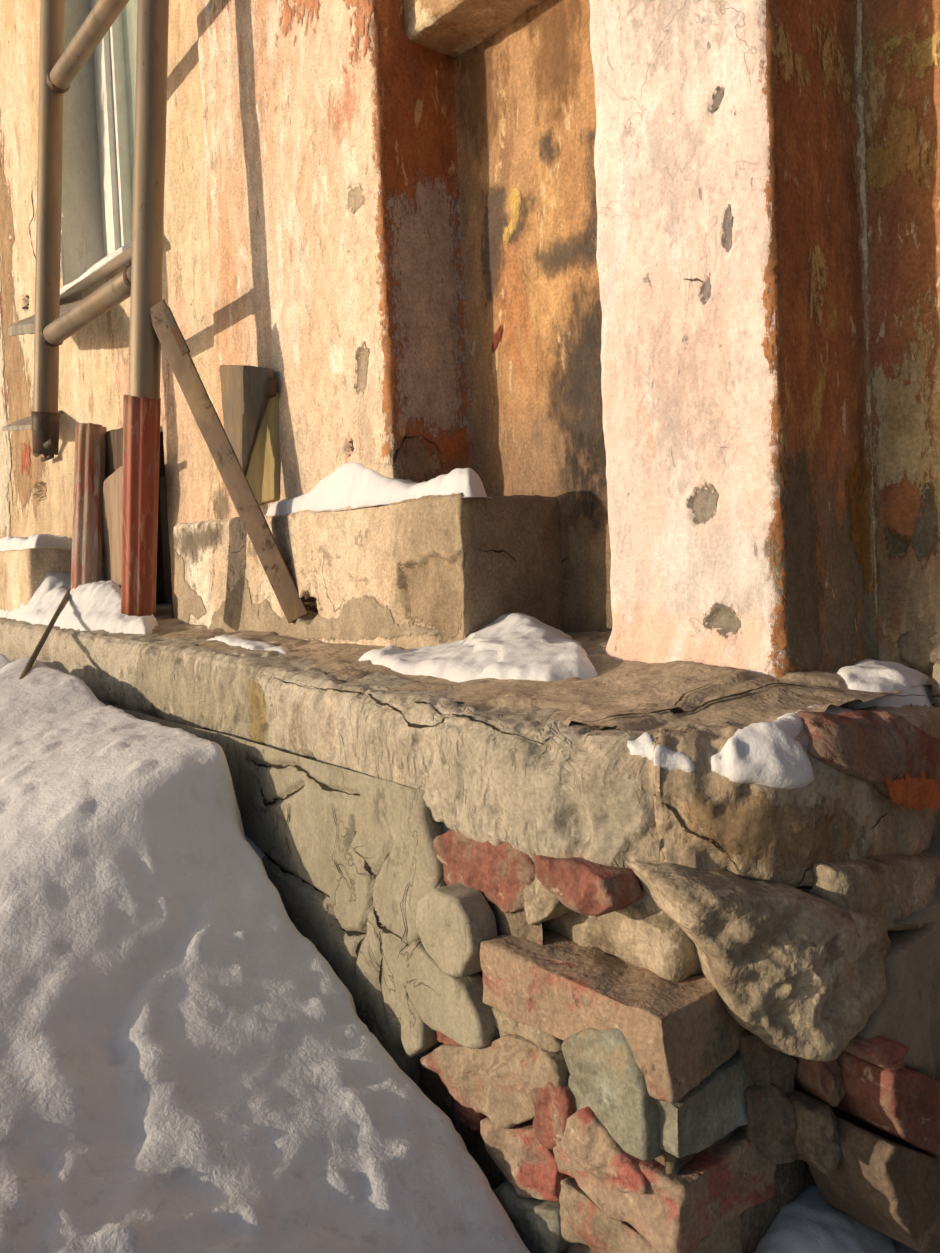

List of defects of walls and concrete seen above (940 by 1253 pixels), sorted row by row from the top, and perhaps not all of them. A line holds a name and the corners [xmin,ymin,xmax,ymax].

peeling [275,0,320,46]
peeling [342,0,472,467]
damp [549,285,606,533]
peeling [757,1,940,677]
peeling [175,546,466,644]
crack [269,676,553,776]
crack [587,682,940,722]
crack [251,760,409,1015]